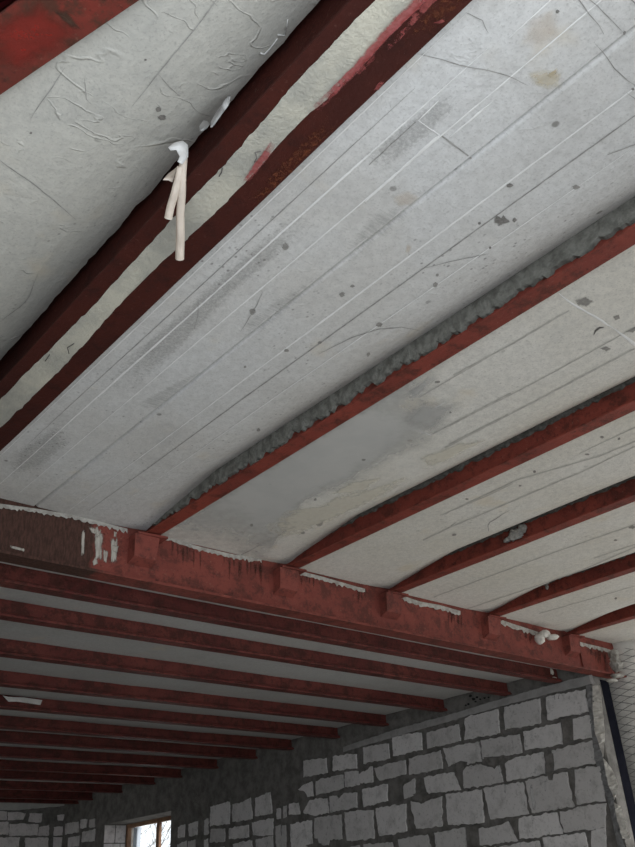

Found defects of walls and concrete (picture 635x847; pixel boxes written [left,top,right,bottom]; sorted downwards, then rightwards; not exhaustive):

peeling [388,0,437,48]
leakage [180,382,433,547]